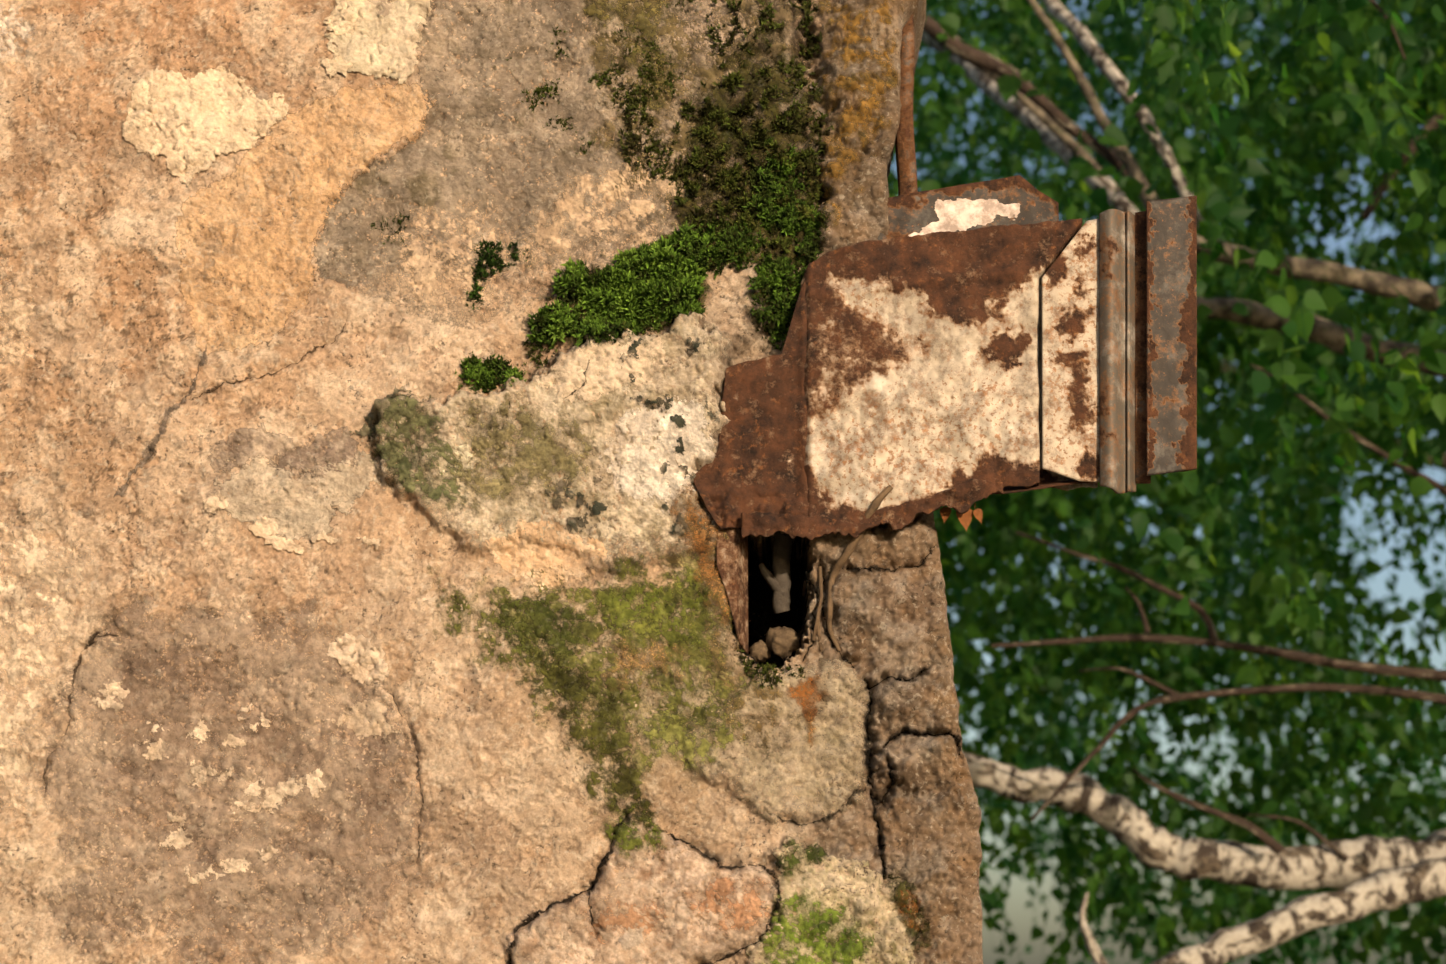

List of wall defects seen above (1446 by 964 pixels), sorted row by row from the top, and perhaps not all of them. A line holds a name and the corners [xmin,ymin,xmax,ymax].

crack [113,320,347,498]
rust [740,479,1004,540]
peeling [687,528,871,822]
crack [768,543,962,879]
crack [505,817,782,964]
spalling [508,819,924,964]